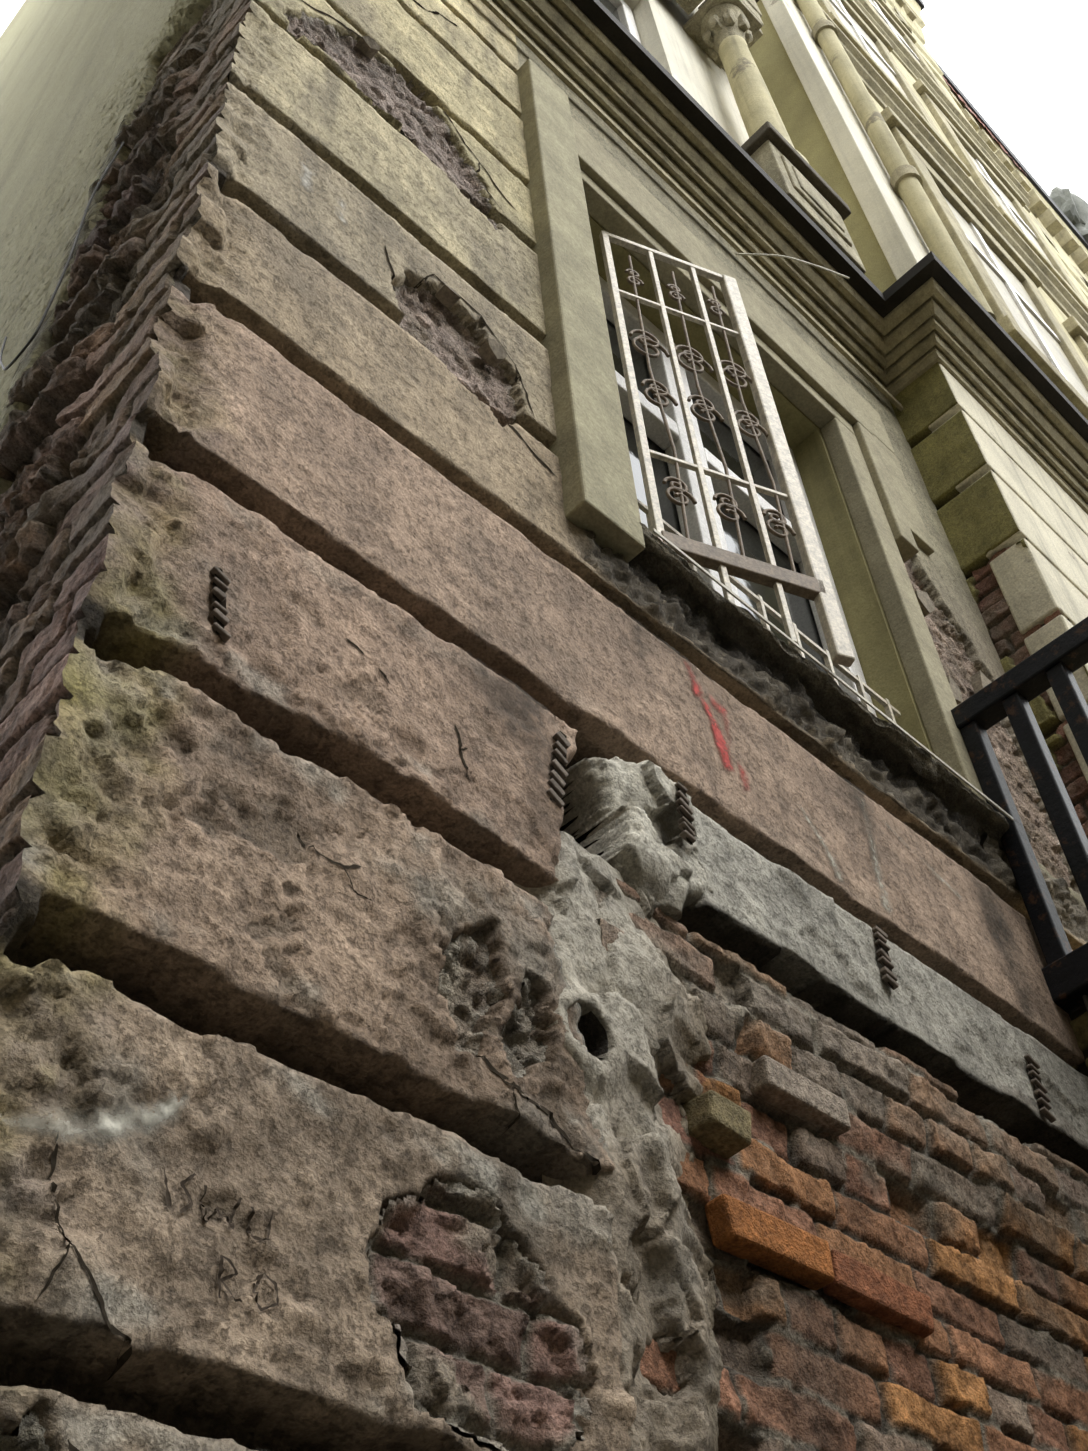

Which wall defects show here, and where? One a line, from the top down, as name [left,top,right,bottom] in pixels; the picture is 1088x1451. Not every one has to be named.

flaking render [284,11,498,230]
flaking render [392,284,517,427]
flaking render [0,0,254,936]
flaking render [972,547,1062,666]
flaking render [1040,691,1088,839]
flaking render [437,831,1088,1451]
crack [36,1130,132,1380]
flaking render [366,1178,597,1451]
crack [68,1440,79,1451]